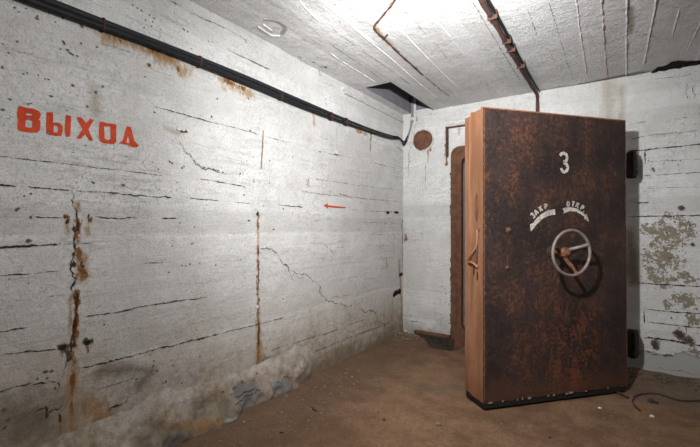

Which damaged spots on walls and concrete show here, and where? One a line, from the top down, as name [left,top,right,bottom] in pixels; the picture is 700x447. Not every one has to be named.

corrosion [102,33,187,76]
corrosion [373,0,448,95]
corrosion [58,290,81,432]
corrosion [63,203,92,281]
crack [0,107,403,418]
peeling [627,205,700,378]